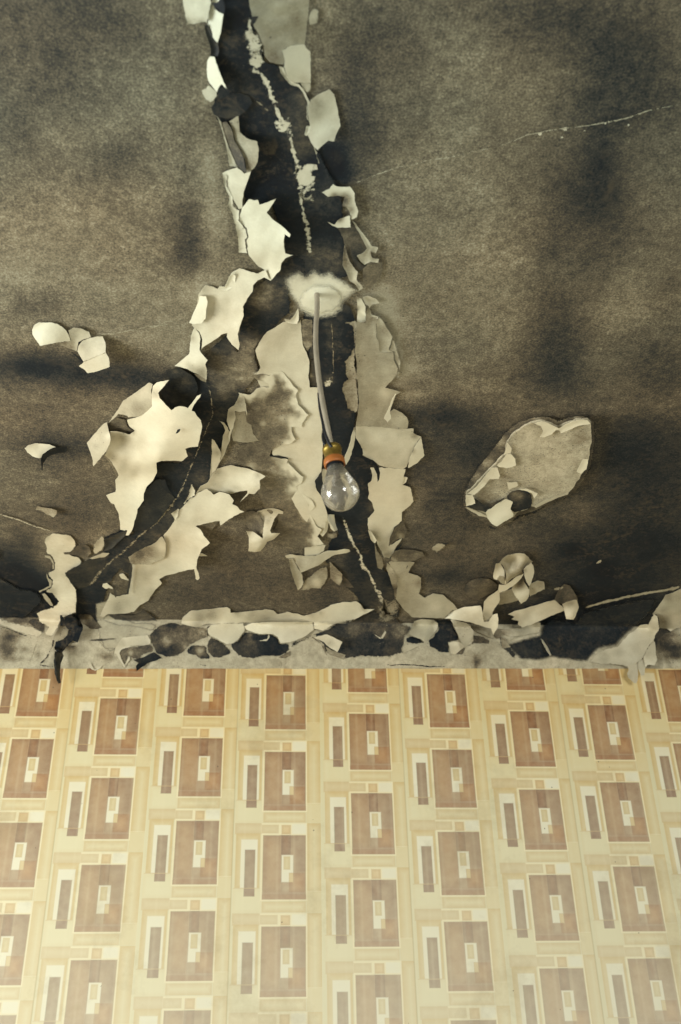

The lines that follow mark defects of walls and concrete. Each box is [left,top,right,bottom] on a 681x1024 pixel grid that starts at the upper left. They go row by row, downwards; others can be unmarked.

crack [245,19,318,253]
crack [356,104,679,183]
peeling [0,0,595,684]
crack [90,390,213,585]
water stain [0,579,44,632]
crack [343,520,399,623]
water stain [509,599,655,660]
crack [586,586,679,608]
peeling [590,589,681,683]